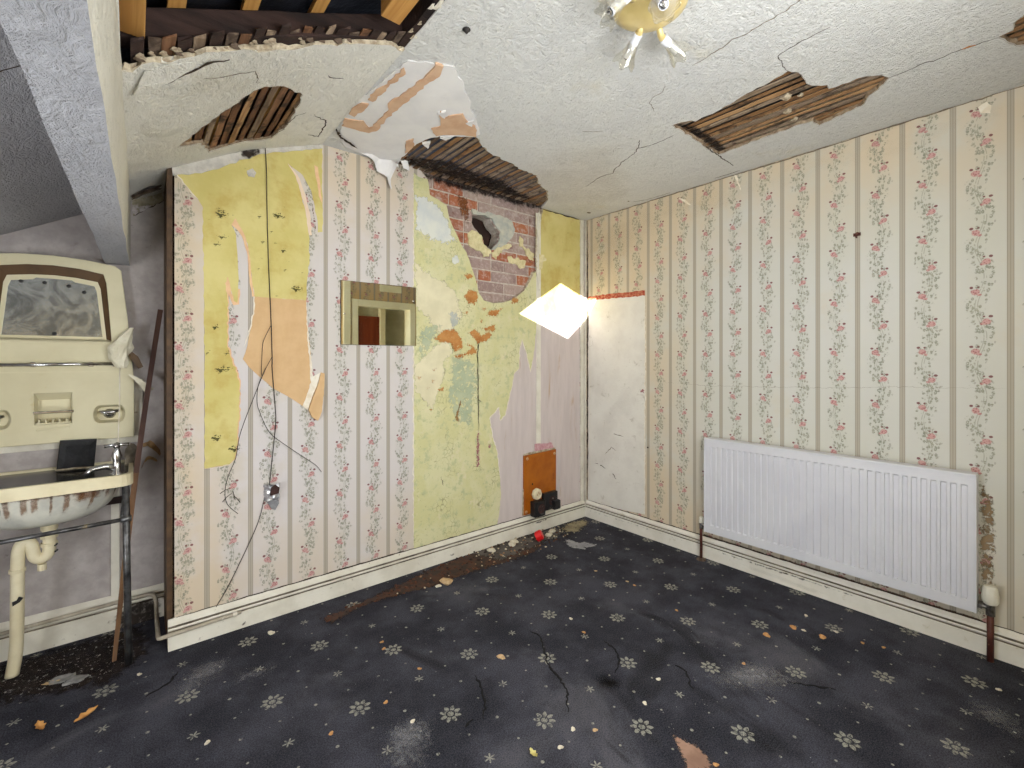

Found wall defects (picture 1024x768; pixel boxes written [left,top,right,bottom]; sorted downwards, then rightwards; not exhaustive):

crack [692,0,800,66]
crack [890,38,996,78]
flaking render [673,71,890,154]
peeling [172,86,323,469]
peeling [399,136,580,548]
crack [176,85,1024,635]
corrosion [2,488,116,519]
damp [979,486,996,584]